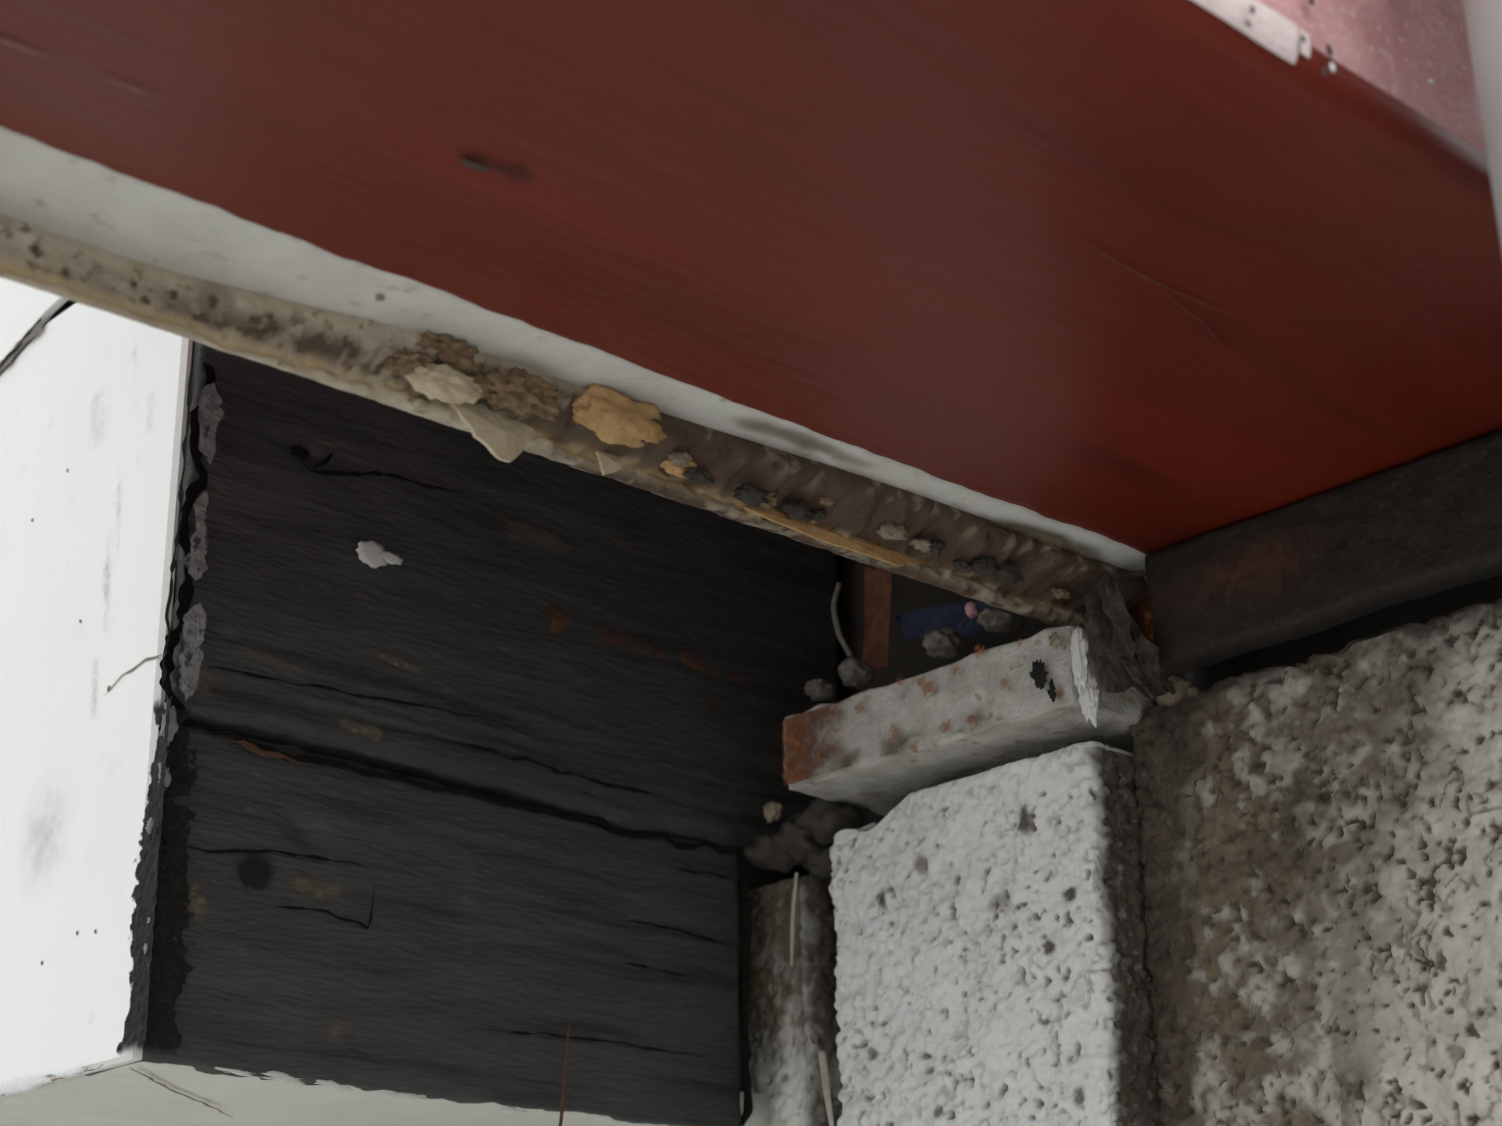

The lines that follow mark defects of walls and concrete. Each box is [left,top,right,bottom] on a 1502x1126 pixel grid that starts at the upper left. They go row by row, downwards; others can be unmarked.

peeling [449,402,537,463]
peeling [595,451,626,475]
peeling [739,501,922,566]
crack [107,652,168,692]
peeling [1029,631,1061,702]
crack [159,666,744,879]
corrosion [782,703,864,786]
corrosion [883,725,918,756]
water stain [1097,598,1502,1126]
crack [609,917,730,946]
crack [468,1026,713,1058]